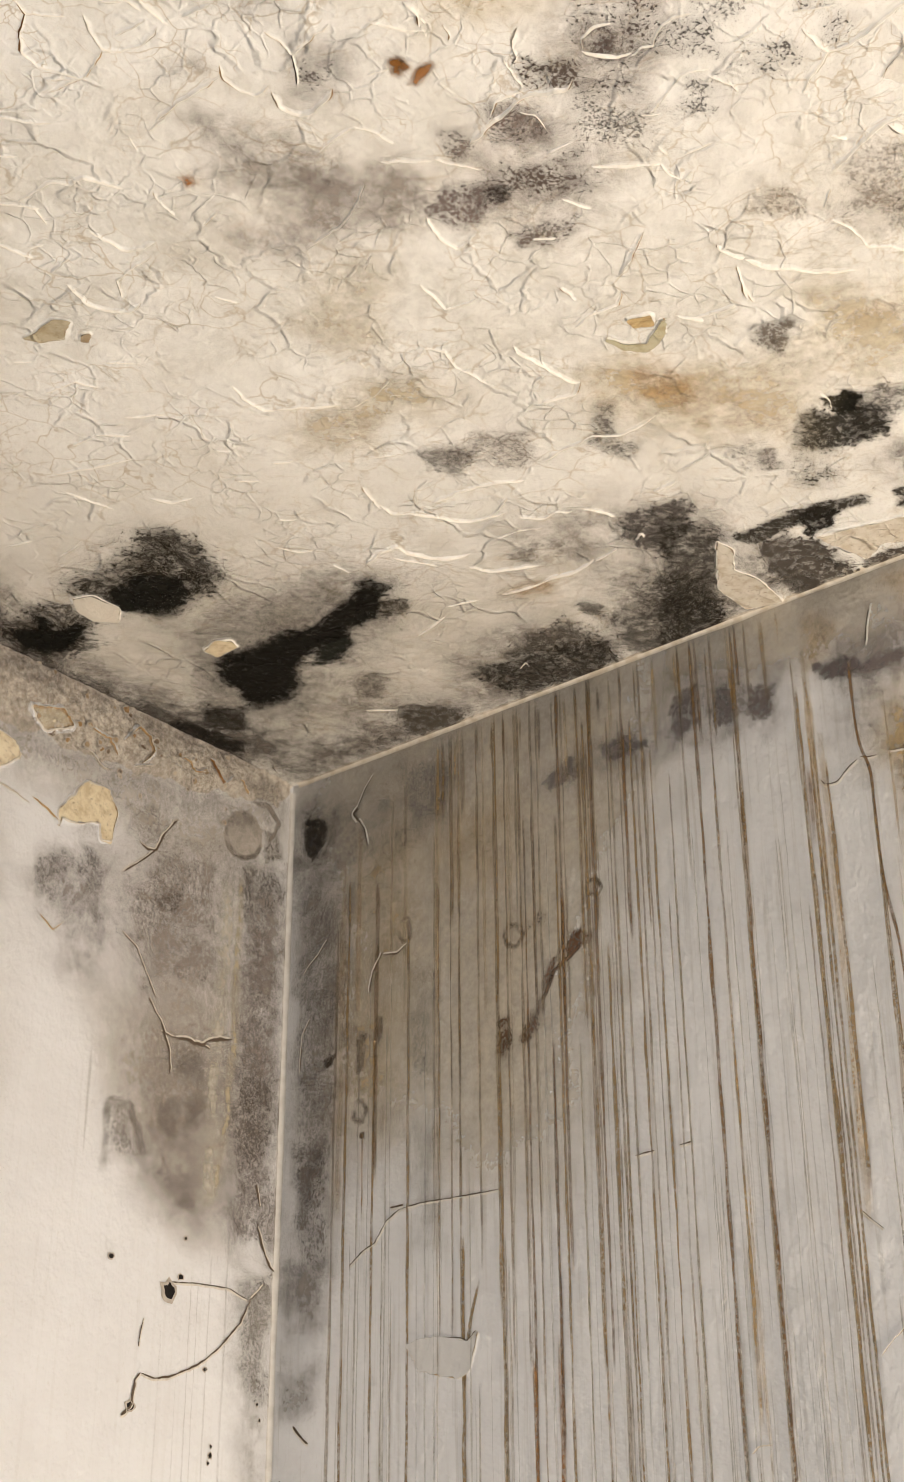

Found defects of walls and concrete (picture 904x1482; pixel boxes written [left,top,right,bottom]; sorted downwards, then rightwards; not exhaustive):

water stain [383,0,803,229]
flaking render [559,232,857,354]
peeling [69,593,124,623]
water stain [0,526,226,683]
peeling [202,637,241,657]
water stain [137,576,413,755]
flaking render [712,539,786,610]
crack [864,603,872,645]
flaking render [0,644,292,846]
water stain [300,372,904,1146]
crack [818,747,904,787]
crack [120,1185,275,1418]